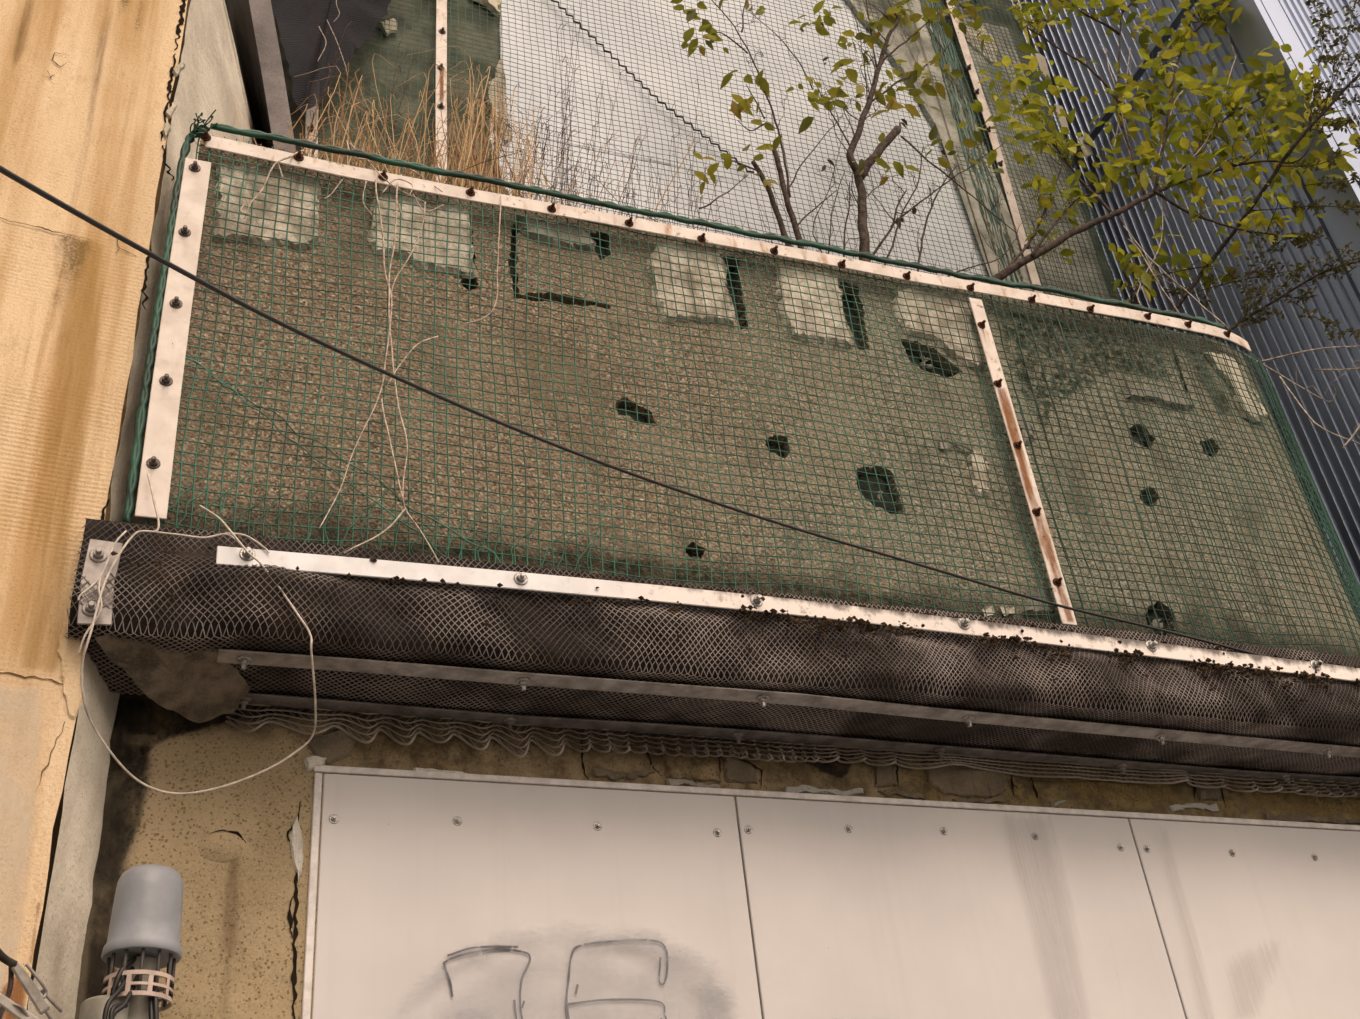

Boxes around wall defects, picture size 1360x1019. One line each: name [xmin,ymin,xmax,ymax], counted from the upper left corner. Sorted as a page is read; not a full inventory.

crack [0,217,136,256]
rust [999,390,1073,621]
crack [0,672,61,684]
crack [35,722,65,792]
leakage [87,746,150,998]